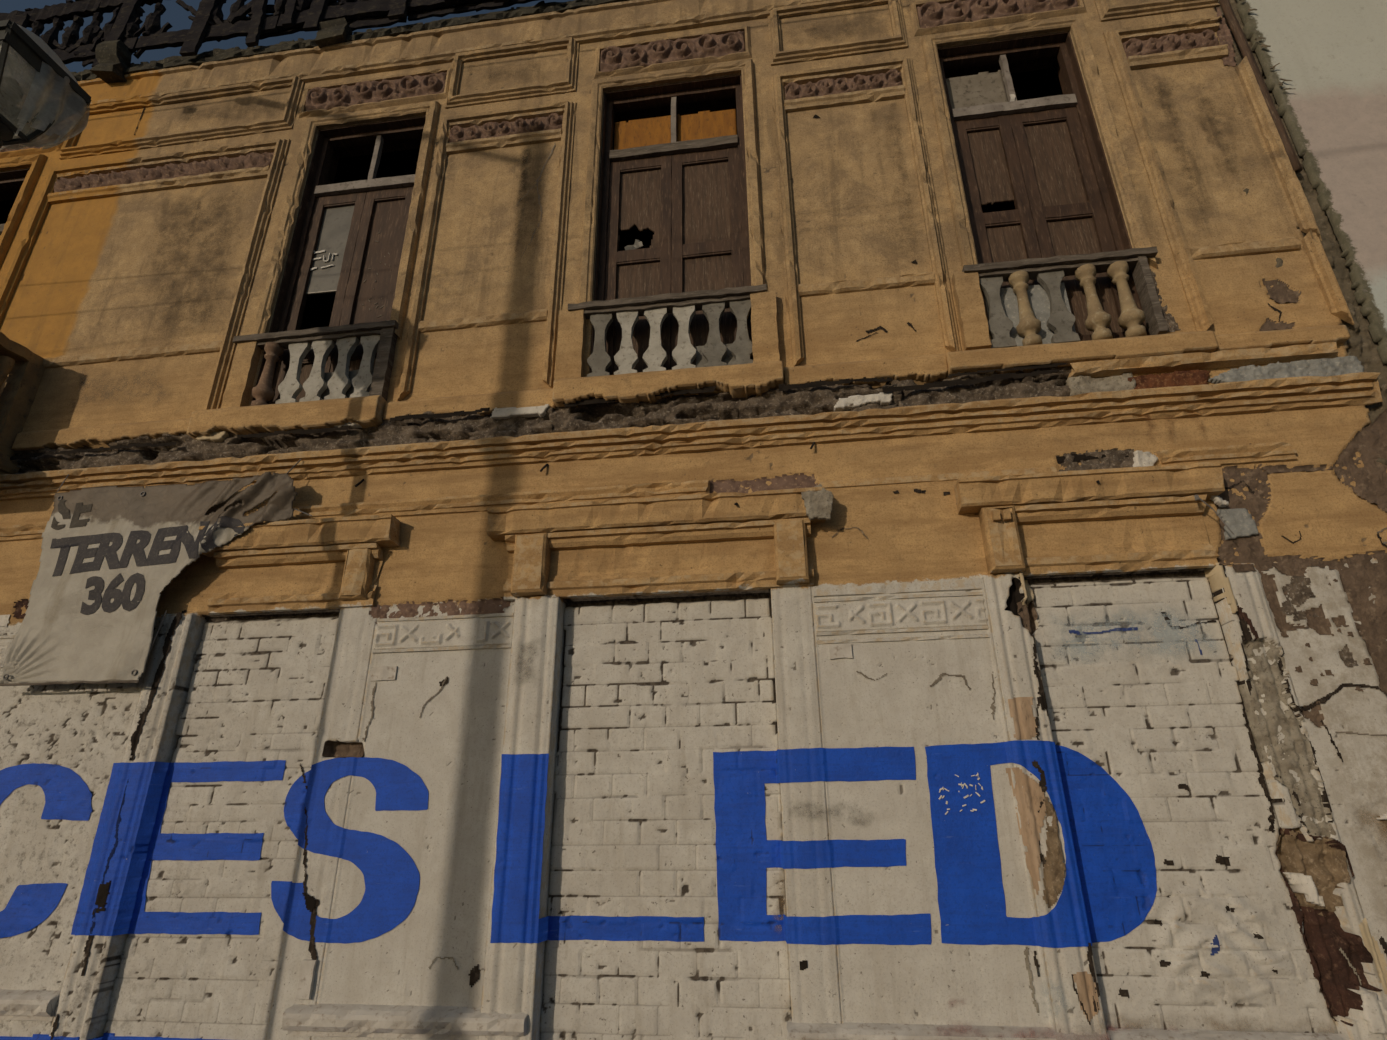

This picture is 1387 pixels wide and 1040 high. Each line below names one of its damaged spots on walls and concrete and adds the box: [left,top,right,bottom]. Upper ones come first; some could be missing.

spalling [10,362,1136,475]
spalling [1056,448,1158,472]
peeling [1208,0,1387,1034]
crack [81,610,186,976]
crack [300,763,319,960]
peeling [1005,767,1066,908]
crack [1204,563,1387,833]
crack [50,1014,59,1040]